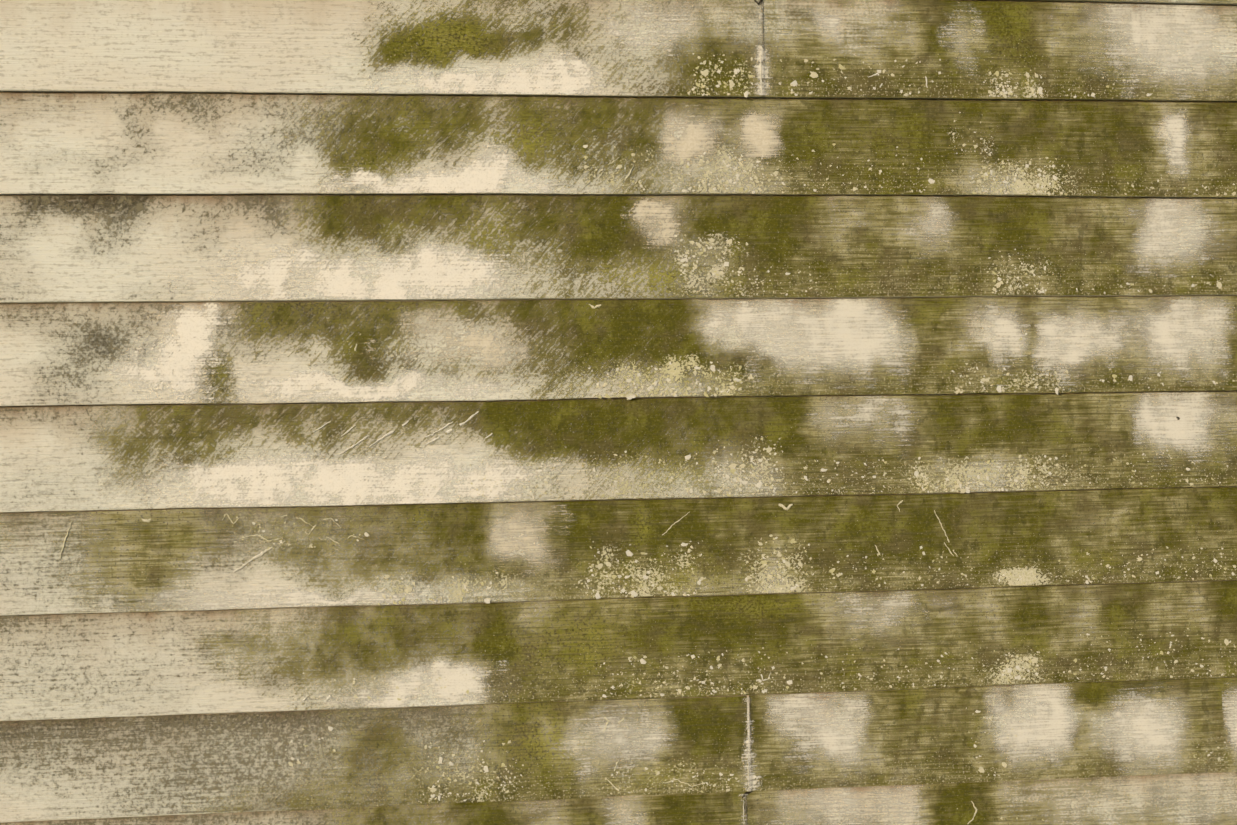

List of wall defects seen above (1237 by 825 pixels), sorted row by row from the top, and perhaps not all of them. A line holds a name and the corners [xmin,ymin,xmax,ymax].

mould [95,94,448,177]
mould [0,196,330,255]
water stain [216,302,389,357]
mould [0,473,490,825]